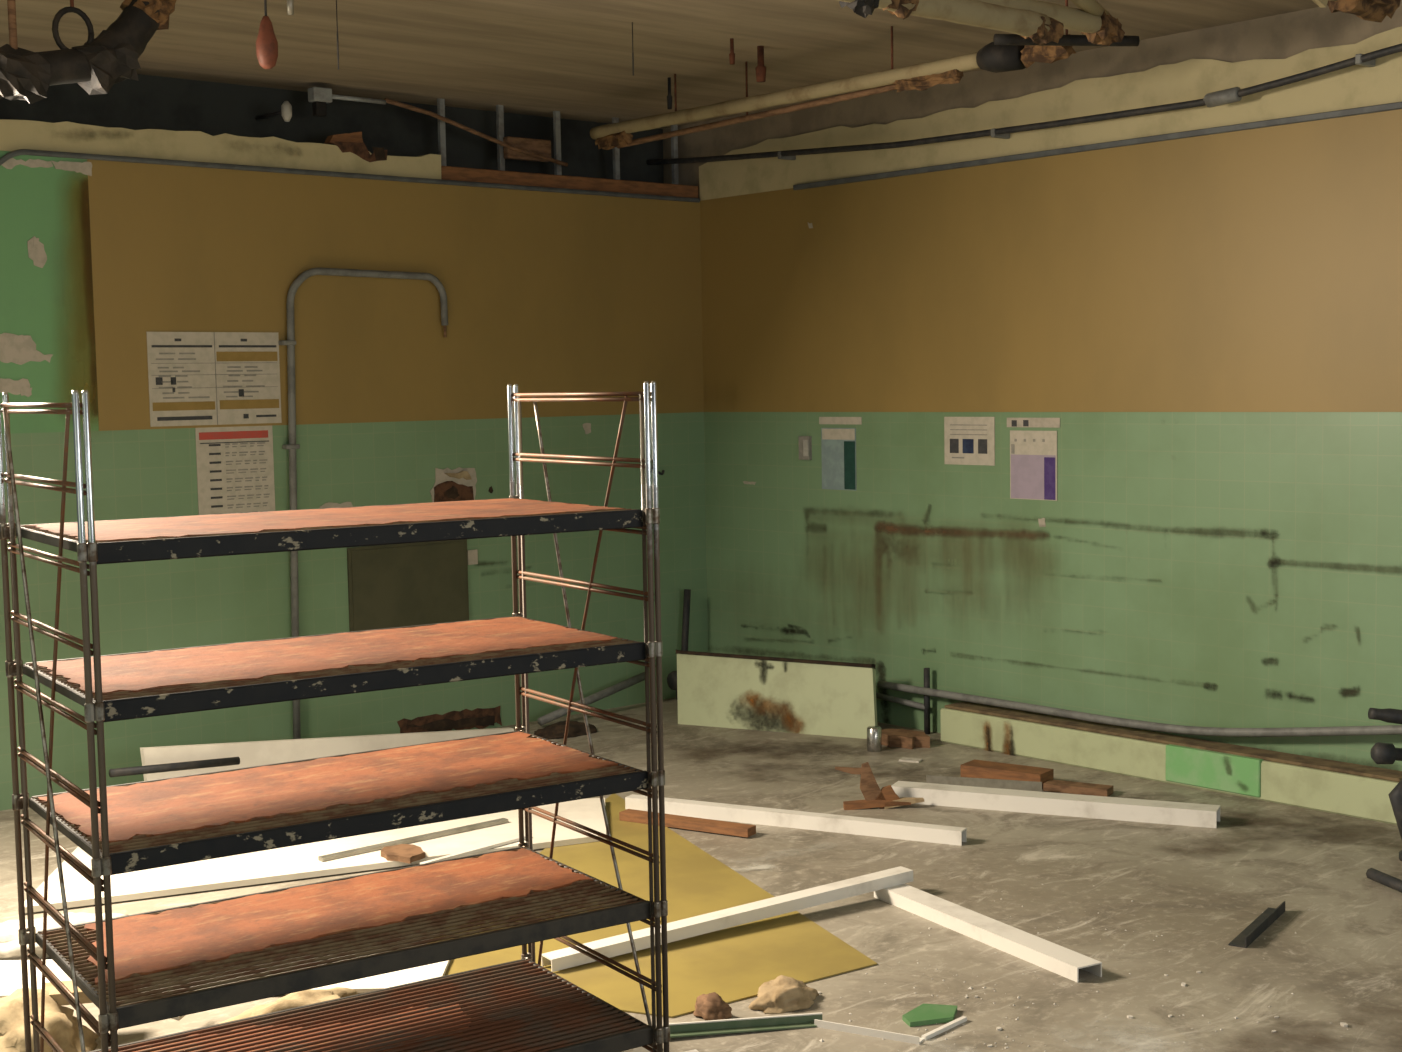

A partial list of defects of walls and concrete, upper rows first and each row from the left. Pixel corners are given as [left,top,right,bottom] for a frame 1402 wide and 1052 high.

peeling [27,236,47,268]
peeling [0,333,53,397]
corrosion [875,522,1045,552]